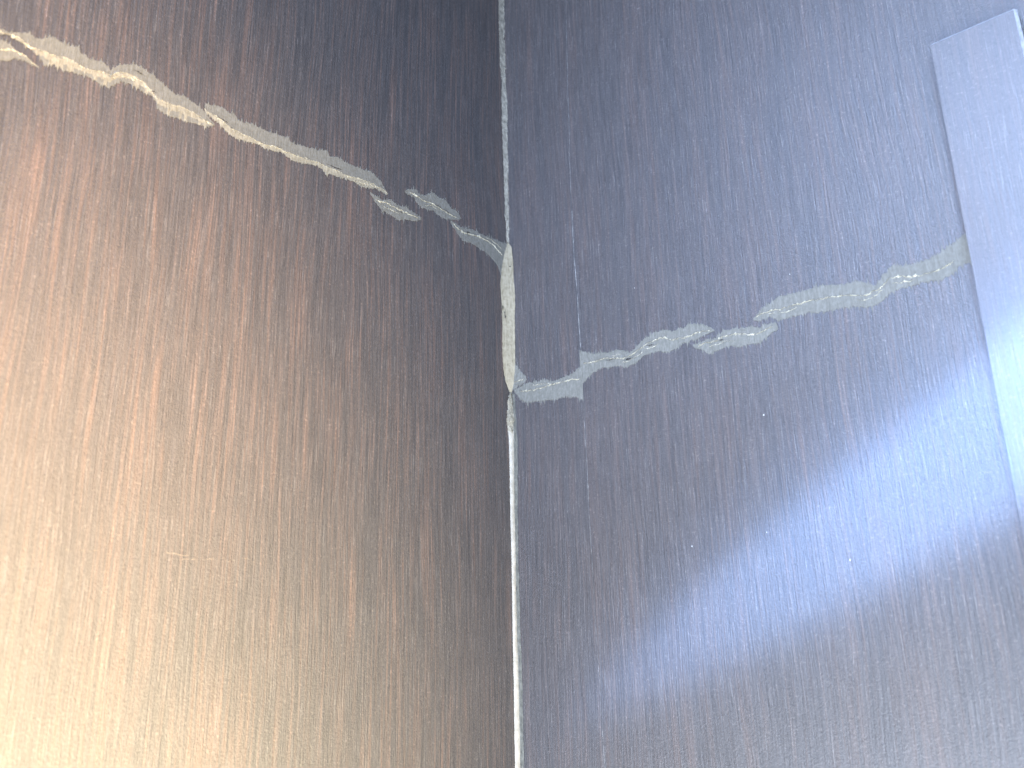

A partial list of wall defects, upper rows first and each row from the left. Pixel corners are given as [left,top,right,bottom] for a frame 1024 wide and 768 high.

crack [0,29,507,273]